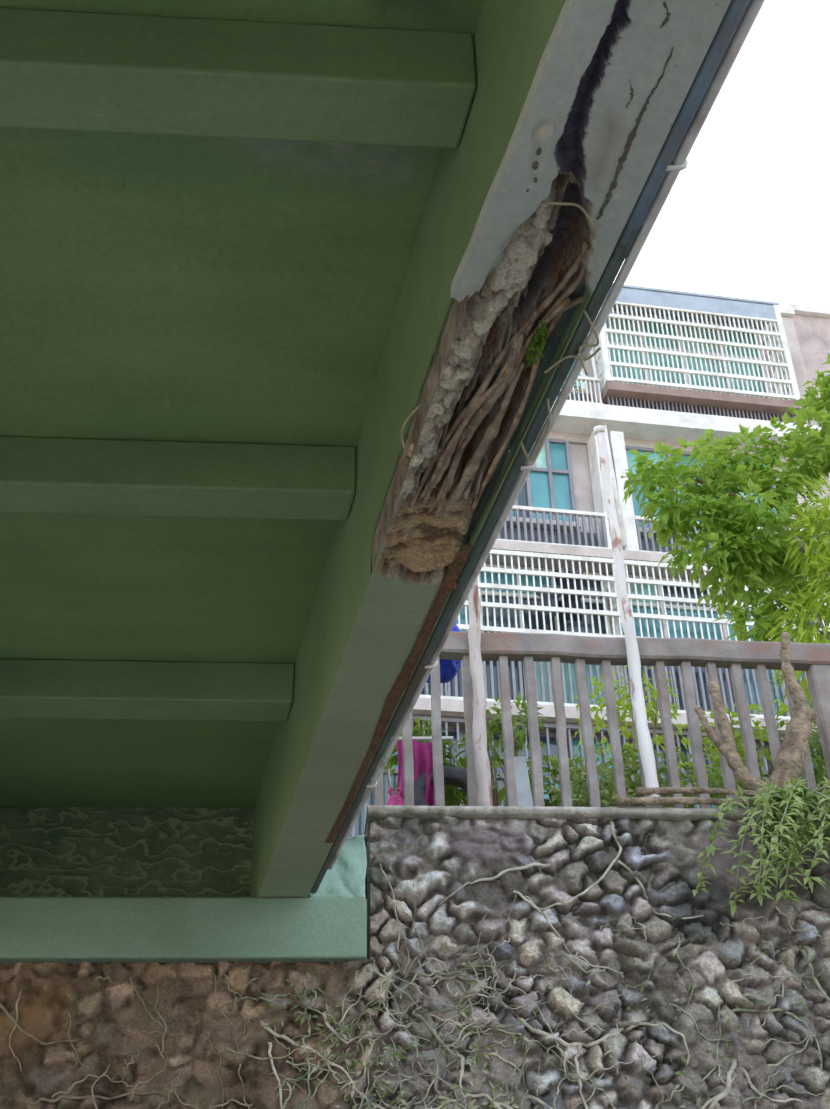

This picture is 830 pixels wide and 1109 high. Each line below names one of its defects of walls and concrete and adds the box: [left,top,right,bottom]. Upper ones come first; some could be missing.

peeling [526,147,542,192]
crack [553,0,674,220]
spalling [372,156,602,589]